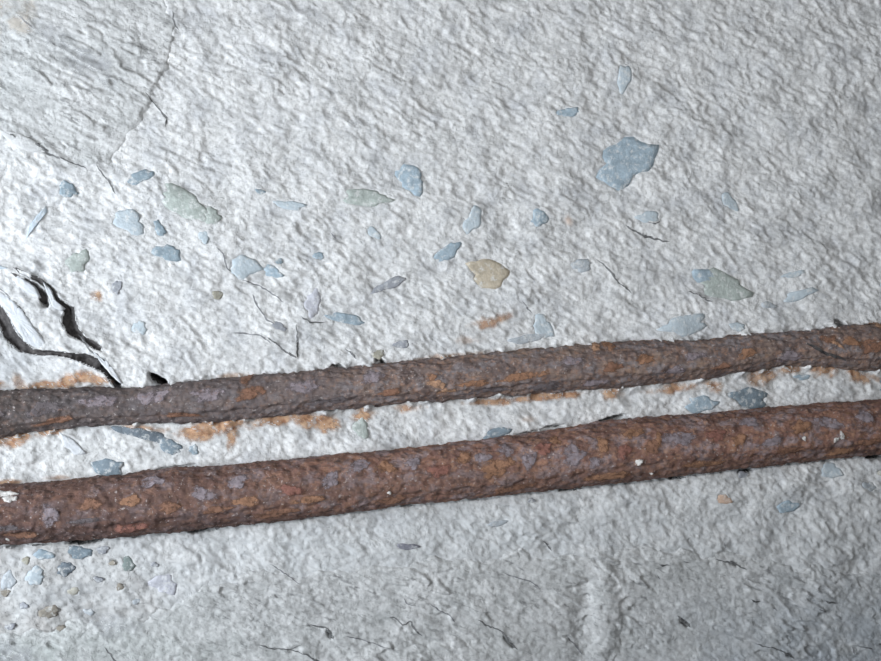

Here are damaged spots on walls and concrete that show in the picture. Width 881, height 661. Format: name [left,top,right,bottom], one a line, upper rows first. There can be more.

spalling [0,0,881,390]
crack [0,267,122,388]
corrosion [23,372,109,389]
corrosion [475,392,580,405]
corrosion [0,429,64,448]
corrosion [181,414,339,445]
spalling [0,365,881,484]
spalling [0,455,881,635]
crack [390,599,455,636]
crack [312,625,389,649]
crack [479,620,518,650]
crack [260,645,316,661]